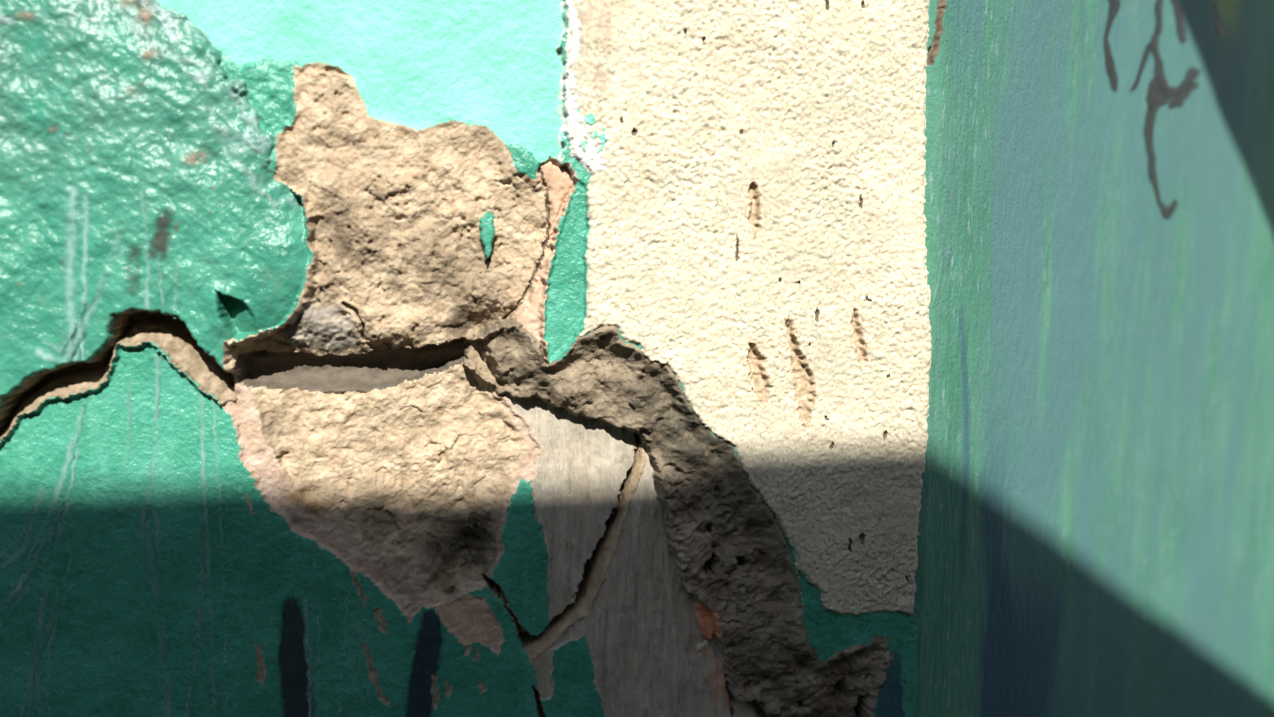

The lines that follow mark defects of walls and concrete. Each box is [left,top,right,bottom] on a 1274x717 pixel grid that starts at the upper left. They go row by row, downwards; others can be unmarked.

crack [0,167,551,442]
flaking render [220,62,894,717]
crack [481,433,647,717]